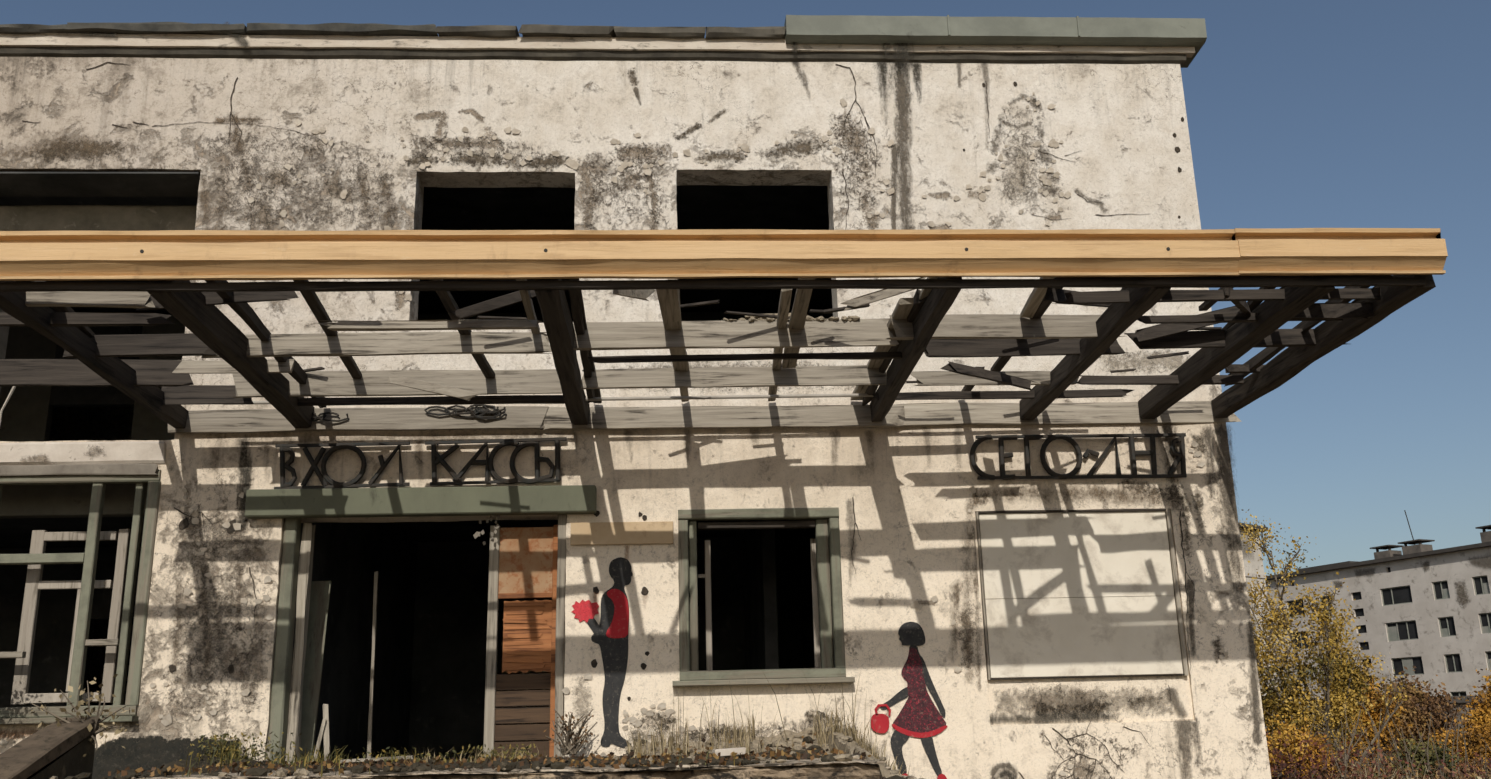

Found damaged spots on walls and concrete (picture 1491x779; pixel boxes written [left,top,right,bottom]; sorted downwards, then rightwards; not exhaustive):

water stain [2,137,121,163]
water stain [359,169,395,225]
crack [835,64,877,227]
water stain [877,43,921,230]
peeling [928,221,952,230]
peeling [922,82,1107,226]
water stain [237,437,251,529]
water stain [1203,424,1243,586]
water stain [1248,621,1261,745]